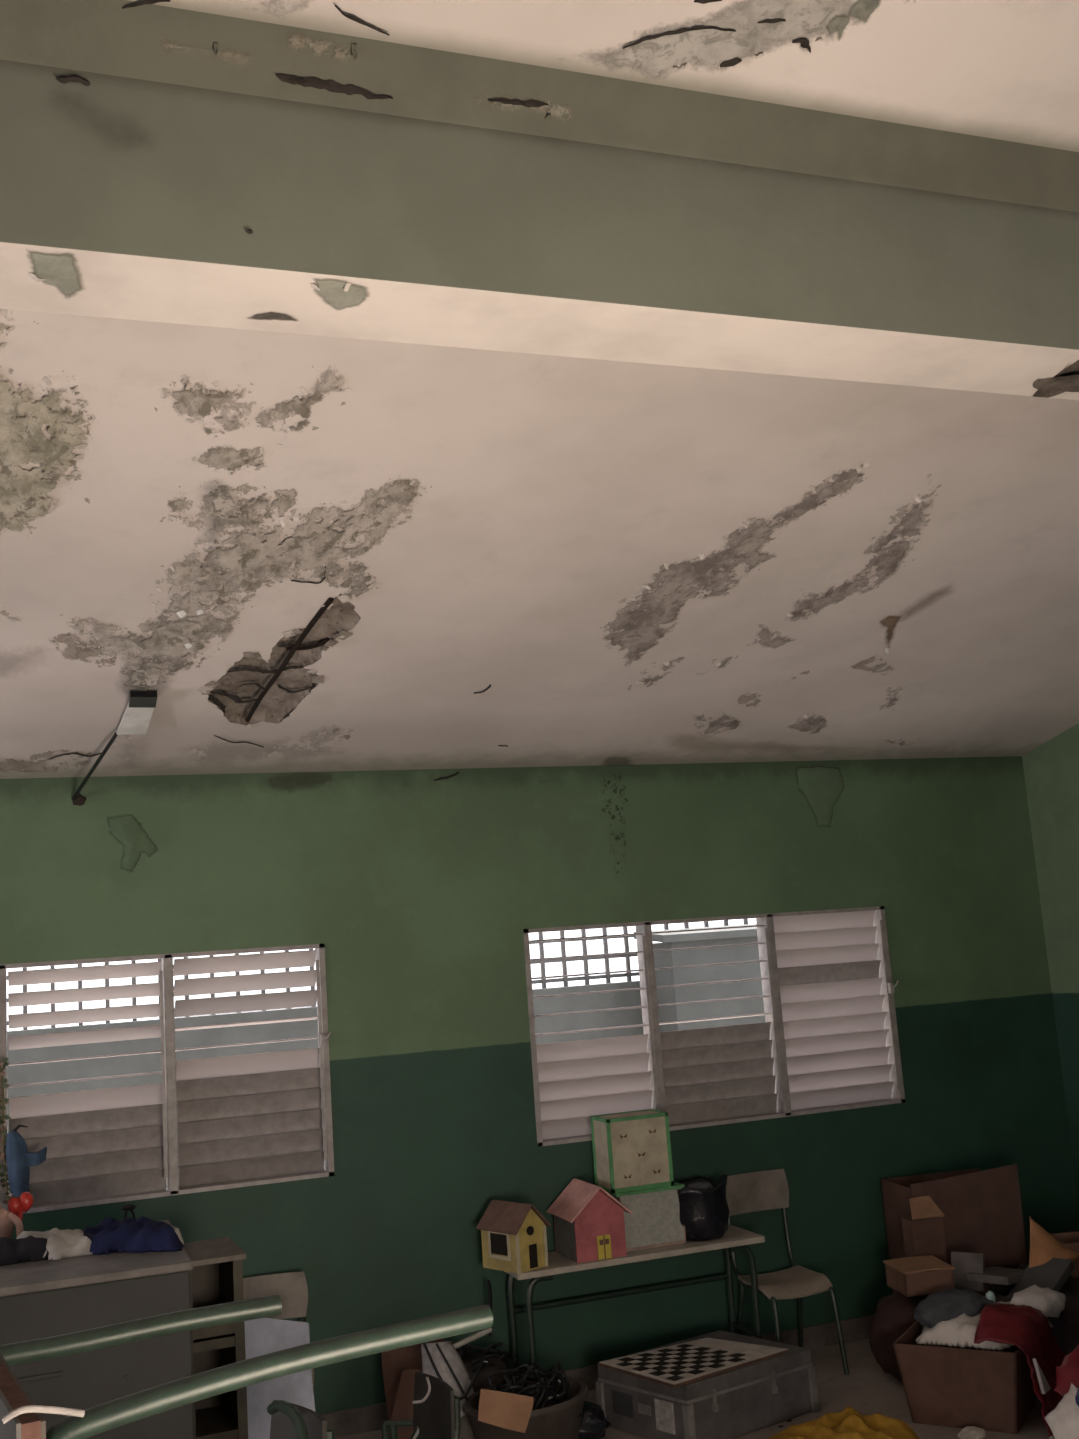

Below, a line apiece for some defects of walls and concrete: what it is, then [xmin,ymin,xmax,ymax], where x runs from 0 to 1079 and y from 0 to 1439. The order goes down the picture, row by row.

crack [335,5,389,36]
crack [623,0,811,68]
peeling [598,0,880,77]
crack [275,74,393,99]
crack [489,98,548,107]
peeling [28,252,81,297]
peeling [310,279,368,310]
spalling [1033,360,1079,398]
peeling [0,369,99,533]
peeling [49,366,432,728]
peeling [600,462,870,690]
peeling [711,474,941,668]